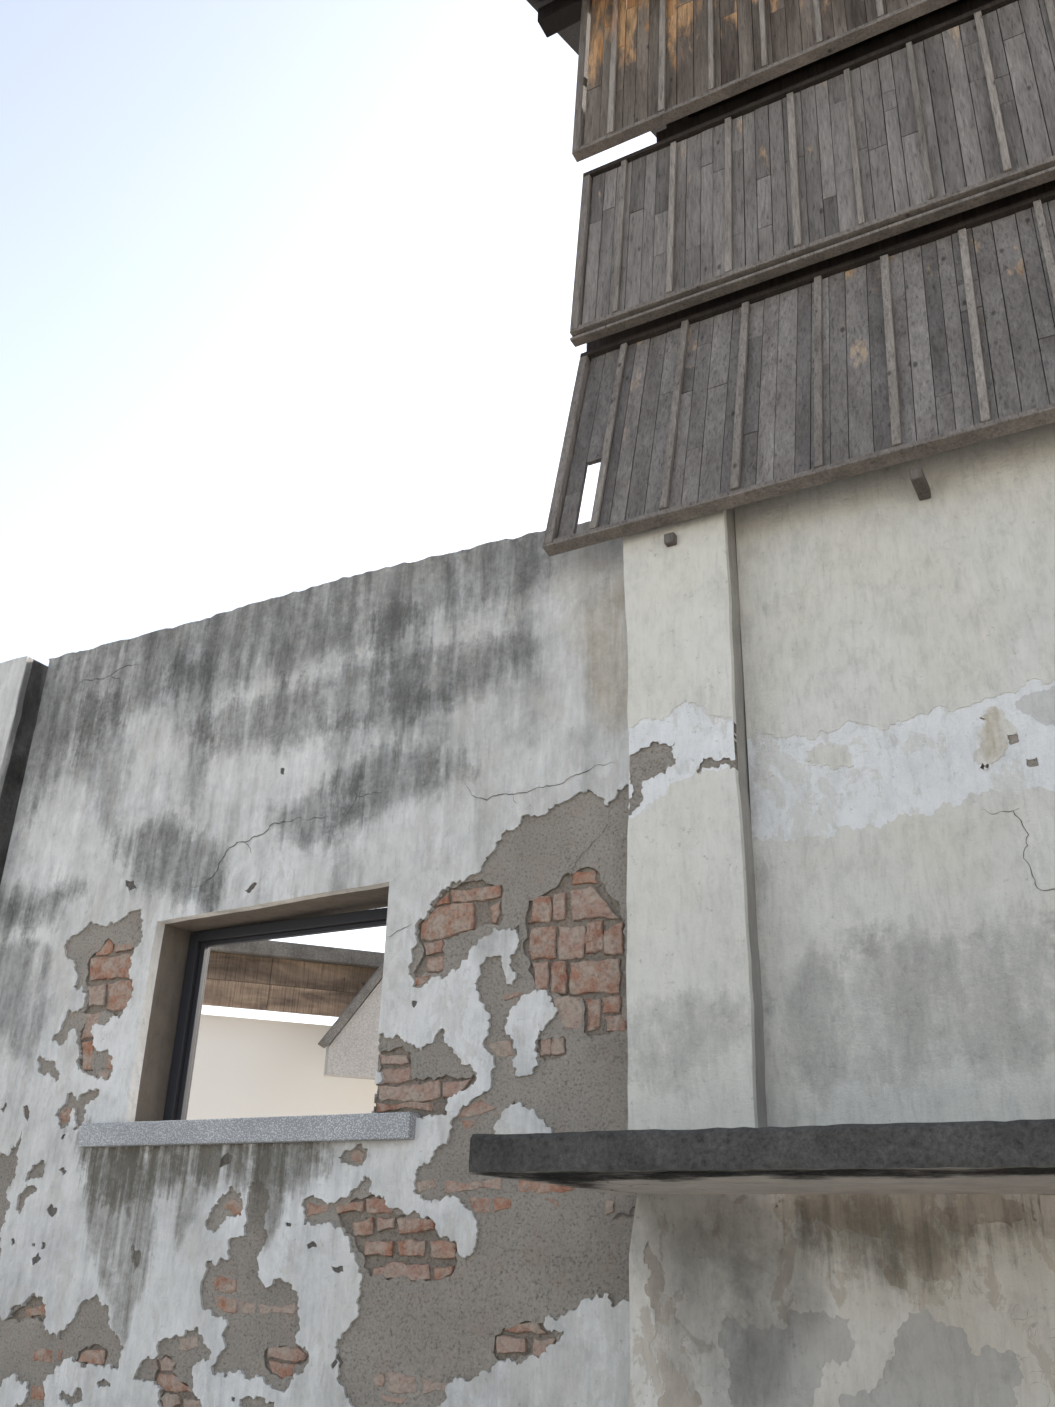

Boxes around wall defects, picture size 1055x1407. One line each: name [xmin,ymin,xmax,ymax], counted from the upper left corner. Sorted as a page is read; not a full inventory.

damp [372,562,415,636]
damp [42,571,372,771]
damp [318,753,449,813]
crack [465,762,615,803]
spalling [39,910,143,1139]
spalling [287,678,1055,1407]
spalling [0,1139,67,1256]
damp [82,1142,330,1325]
damp [469,1168,1055,1188]
spalling [0,1294,124,1407]
spalling [135,1180,309,1407]